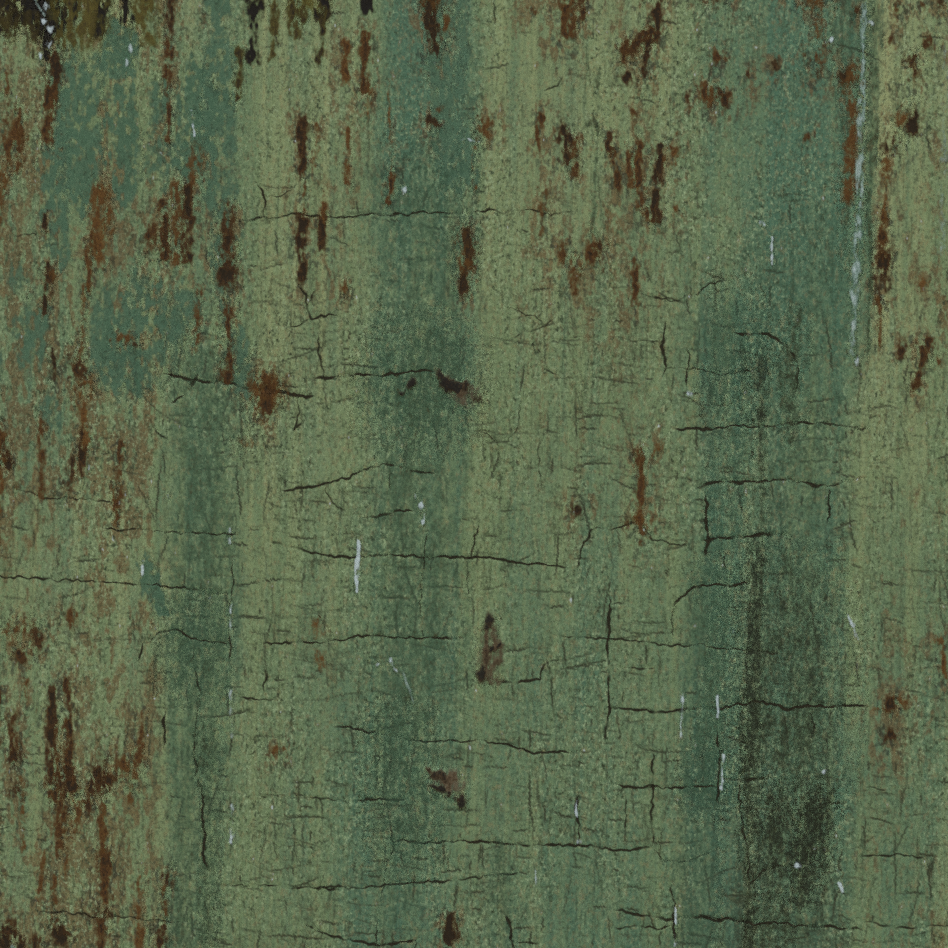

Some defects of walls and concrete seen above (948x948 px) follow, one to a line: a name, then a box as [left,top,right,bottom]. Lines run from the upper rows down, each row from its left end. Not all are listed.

corrosion [144,148,205,266]
corrosion [216,202,239,290]
corrosion [605,131,678,223]
corrosion [873,108,919,346]
crack [166,287,433,429]
crack [283,463,433,510]
crack [0,575,197,590]
crack [265,478,865,739]
corrosion [37,677,145,948]
crack [232,734,795,894]
corrosion [0,919,71,948]
crack [617,887,947,940]